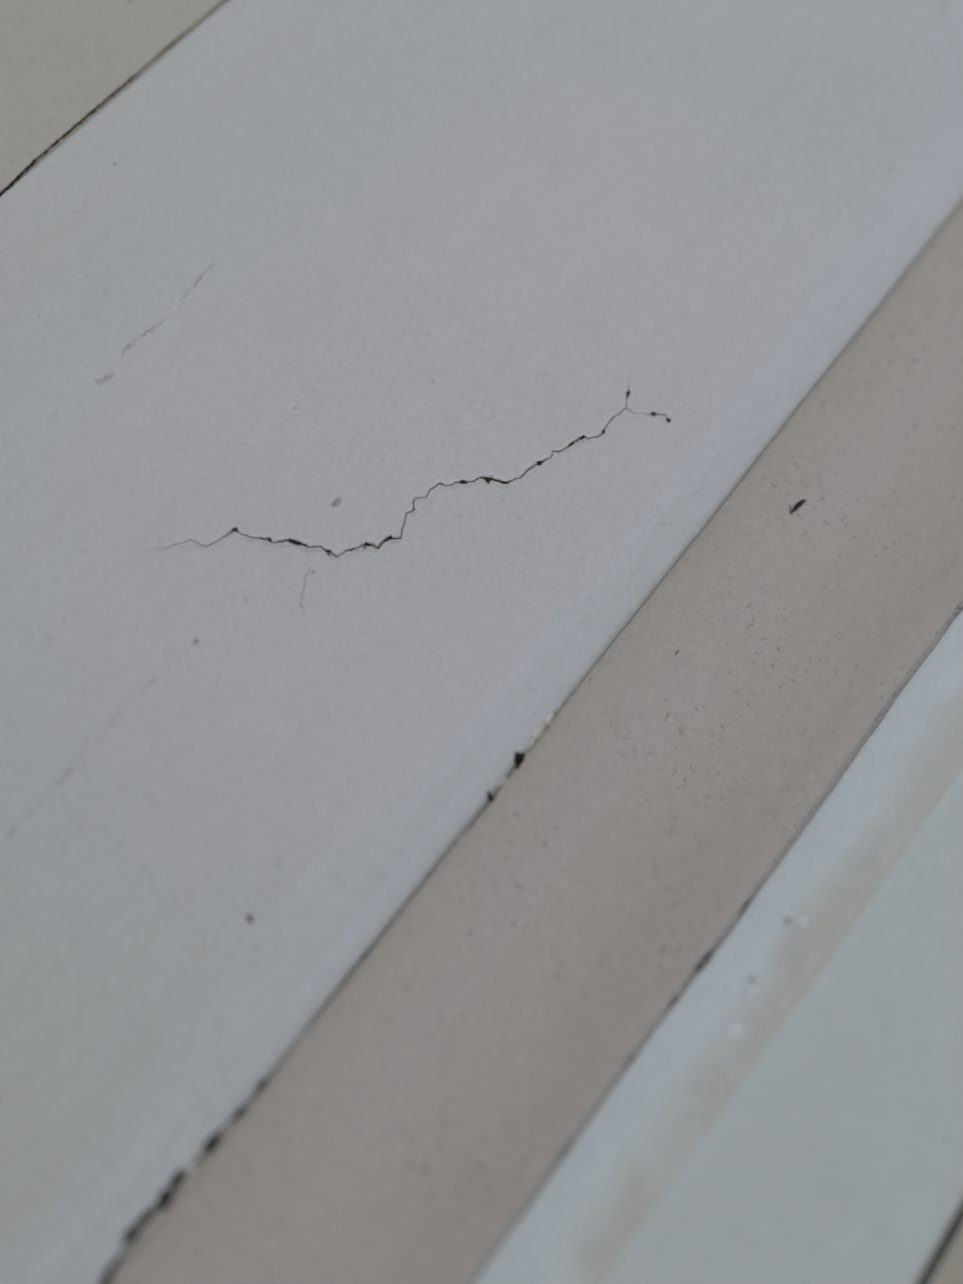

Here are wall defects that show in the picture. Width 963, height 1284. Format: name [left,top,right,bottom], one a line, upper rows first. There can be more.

crack [139,386,671,572]